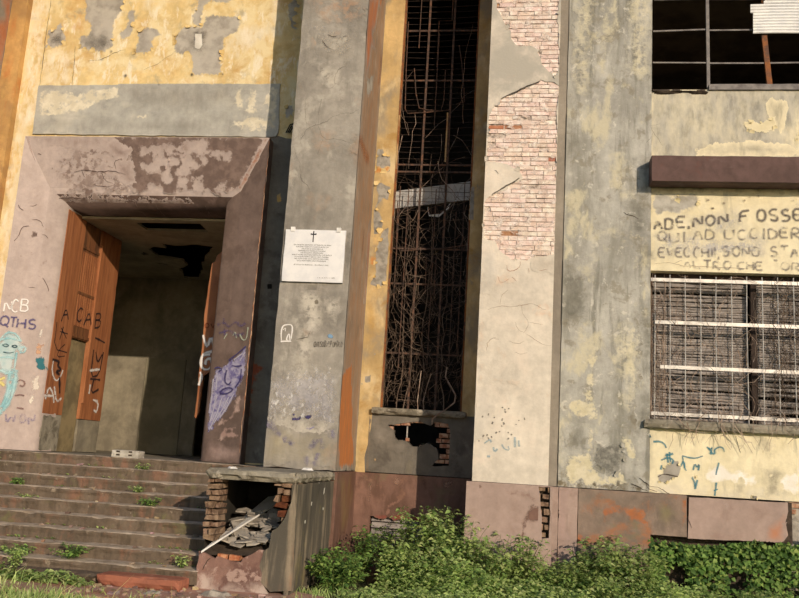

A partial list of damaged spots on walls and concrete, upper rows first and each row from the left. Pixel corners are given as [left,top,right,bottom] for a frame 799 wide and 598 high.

peeling [172,0,302,77]
peeling [0,0,162,304]
peeling [113,86,295,196]
flaking render [469,0,559,261]
peeling [743,116,778,134]
rust [336,0,390,537]
peeling [370,149,391,289]
damp [530,256,594,327]
flaking render [419,422,450,464]
damp [558,310,799,527]
spalling [206,480,287,528]
flaking render [539,487,550,538]